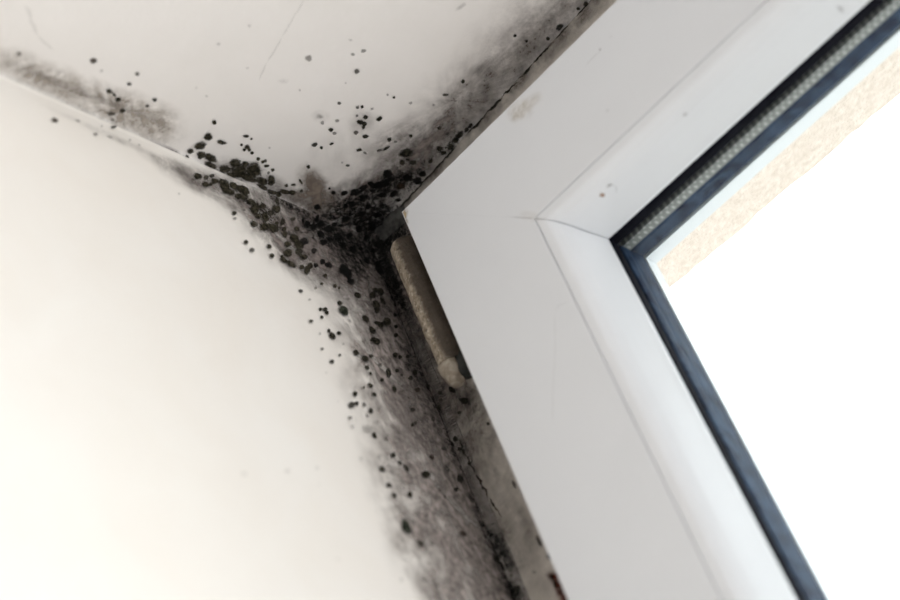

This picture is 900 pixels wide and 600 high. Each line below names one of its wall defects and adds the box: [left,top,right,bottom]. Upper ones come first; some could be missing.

water stain [18,66,169,134]
water stain [162,0,599,600]